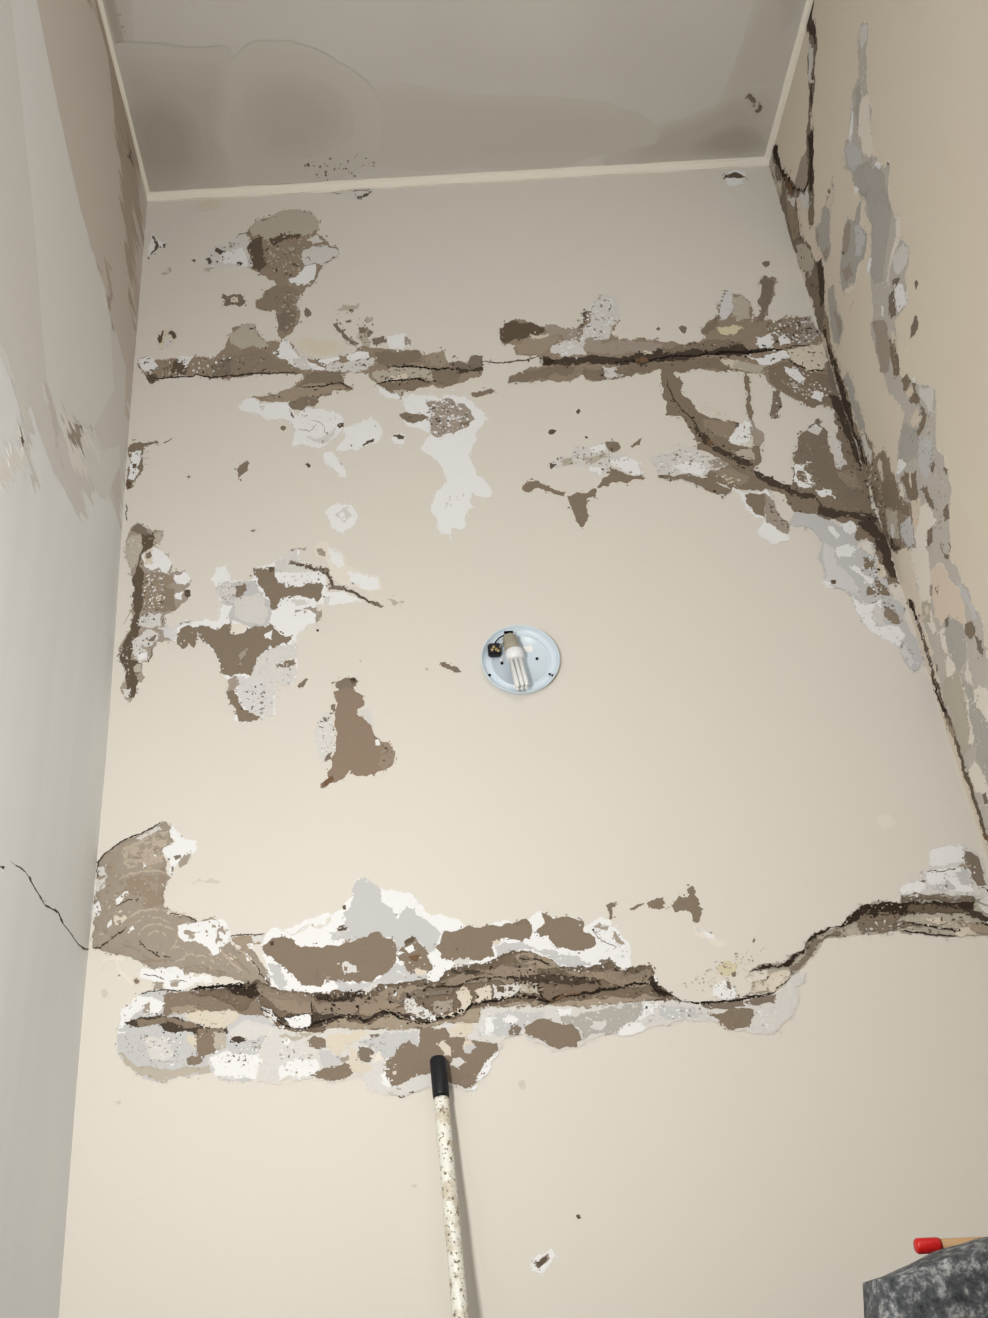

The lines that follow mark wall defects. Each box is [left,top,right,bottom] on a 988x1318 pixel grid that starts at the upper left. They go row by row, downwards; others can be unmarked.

crack [769,1,916,554]
peeling [134,176,925,673]
crack [744,373,782,420]
peeling [117,522,328,724]
peeling [314,676,397,789]
crack [906,599,988,844]
crack [0,863,88,951]
crack [96,821,164,874]
peeling [102,956,808,1098]
peeling [252,875,703,996]
crack [189,895,988,1033]
peeling [898,843,988,905]